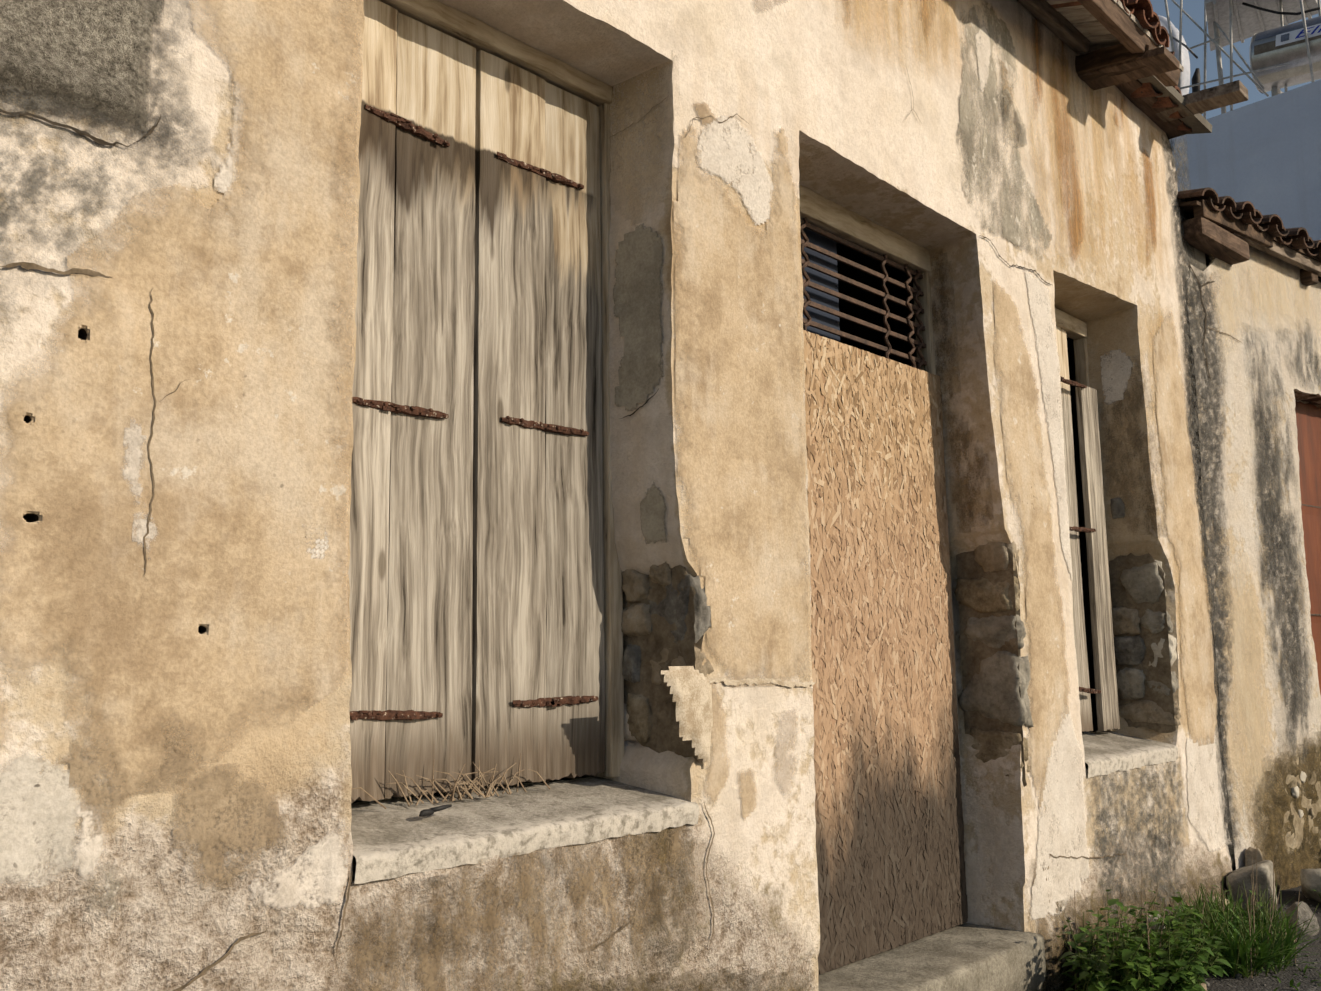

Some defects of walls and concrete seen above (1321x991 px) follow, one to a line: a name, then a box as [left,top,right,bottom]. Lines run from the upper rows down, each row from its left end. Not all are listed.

crack [0,262,110,278]
crack [0,109,161,147]
crack [143,290,189,575]
peeling [0,0,360,886]
peeling [613,102,812,819]
flaking render [958,2,1052,255]
peeling [954,281,1070,807]
peeling [1109,313,1219,746]
leakage [1162,138,1309,846]
leakage [1290,327,1321,383]
crack [173,928,268,991]